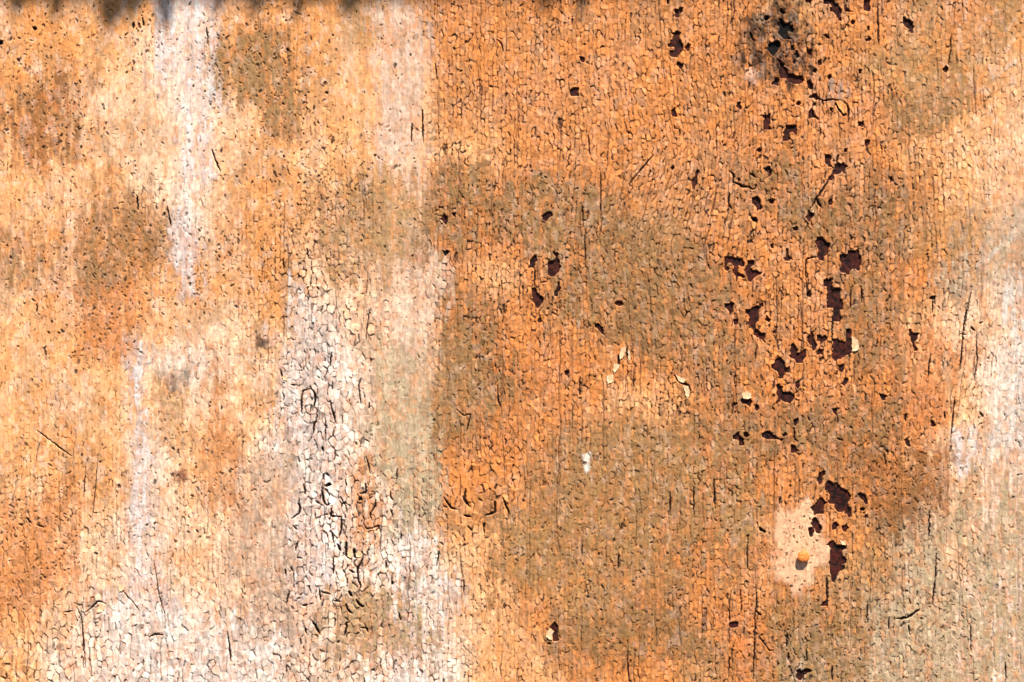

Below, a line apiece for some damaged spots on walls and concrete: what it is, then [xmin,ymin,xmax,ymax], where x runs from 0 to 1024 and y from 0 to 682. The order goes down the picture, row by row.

peeling [764,9,831,119]
crack [809,155,839,212]
peeling [529,251,561,323]
peeling [724,302,776,343]
peeling [771,249,861,404]
corrosion [0,499,78,612]
corrosion [208,358,246,518]
crack [280,353,402,635]
corrosion [353,453,380,548]
corrosion [477,330,602,445]
corrosion [723,539,775,680]
peeling [759,471,868,597]